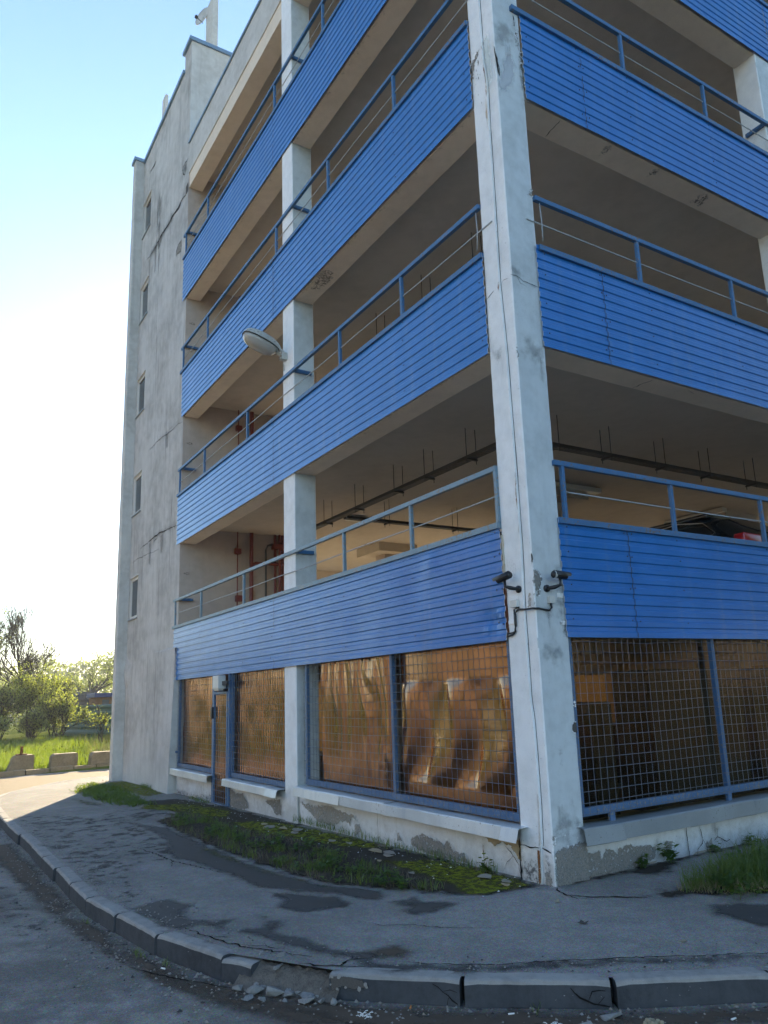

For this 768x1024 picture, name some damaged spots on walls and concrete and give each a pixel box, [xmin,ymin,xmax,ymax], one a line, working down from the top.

crack [148,159,188,258]
peeling [266,798,282,816]
peeling [300,801,361,835]
peeling [396,831,467,863]
peeling [487,837,522,861]
crack [504,830,551,880]
peeling [544,837,673,887]
crack [183,927,365,967]
spalling [232,974,368,1006]
crack [416,953,766,1007]